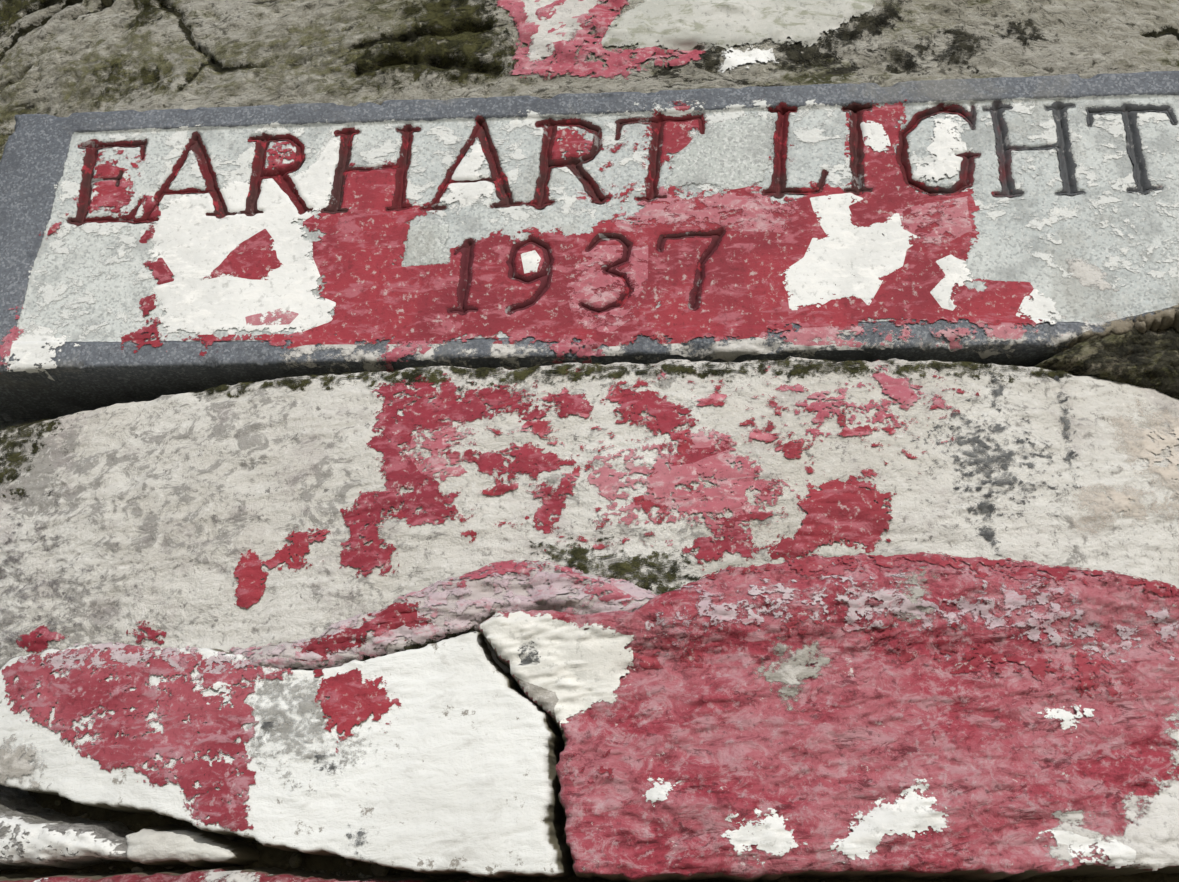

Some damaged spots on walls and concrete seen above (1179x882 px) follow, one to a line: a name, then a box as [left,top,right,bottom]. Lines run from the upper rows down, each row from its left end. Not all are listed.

crack [0,0,114,62]
crack [158,0,266,91]
spalling [496,0,881,80]
peeling [0,98,1179,381]
peeling [233,365,1179,738]
peeling [2,621,293,832]
peeling [311,668,402,753]
peeling [0,814,126,864]
peeling [199,870,273,882]
peeling [721,807,808,864]
peeling [827,778,949,863]
spalling [1036,704,1179,871]